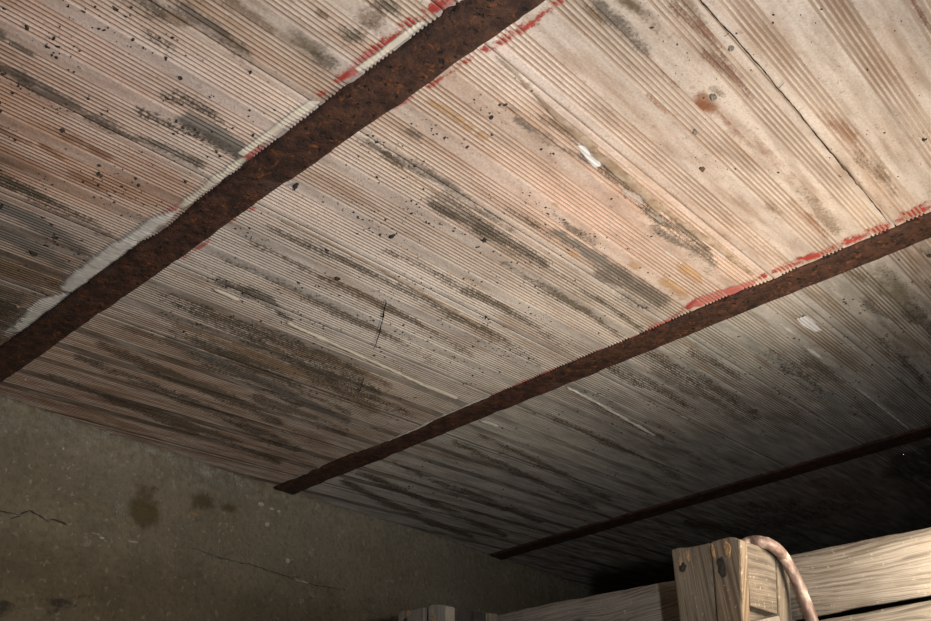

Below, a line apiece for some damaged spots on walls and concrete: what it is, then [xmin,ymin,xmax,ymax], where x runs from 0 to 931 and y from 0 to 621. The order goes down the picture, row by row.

leakage [25,18,81,59]
corrosion [699,92,717,111]
crack [700,0,890,224]
corrosion [830,122,895,194]
leakage [0,169,92,269]
leakage [758,267,931,402]
leakage [578,339,765,448]
crack [0,510,67,525]
leakage [342,434,619,538]